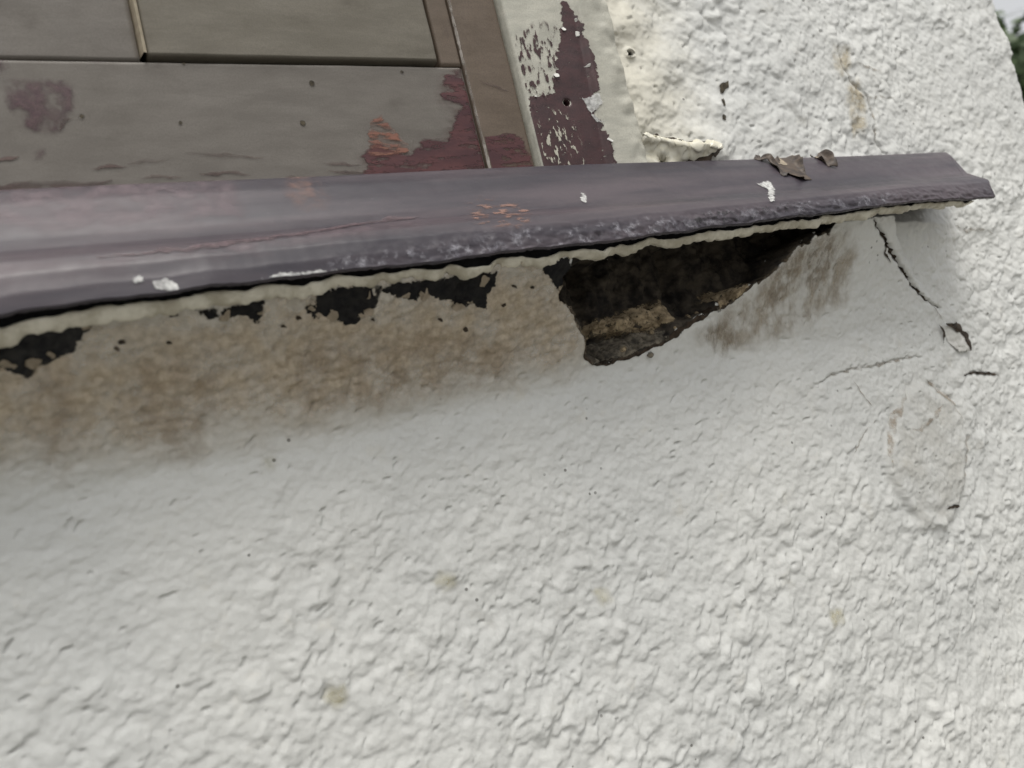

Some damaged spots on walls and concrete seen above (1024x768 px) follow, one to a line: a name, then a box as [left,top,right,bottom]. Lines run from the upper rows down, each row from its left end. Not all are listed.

peeling [362,1,617,174]
peeling [642,132,723,162]
peeling [133,275,179,291]
peeling [195,300,265,324]
peeling [271,269,338,277]
peeling [281,271,498,328]
spalling [543,222,835,366]
crack [874,221,941,316]
peeling [0,326,92,379]
damp [0,274,578,436]
crack [964,369,997,377]